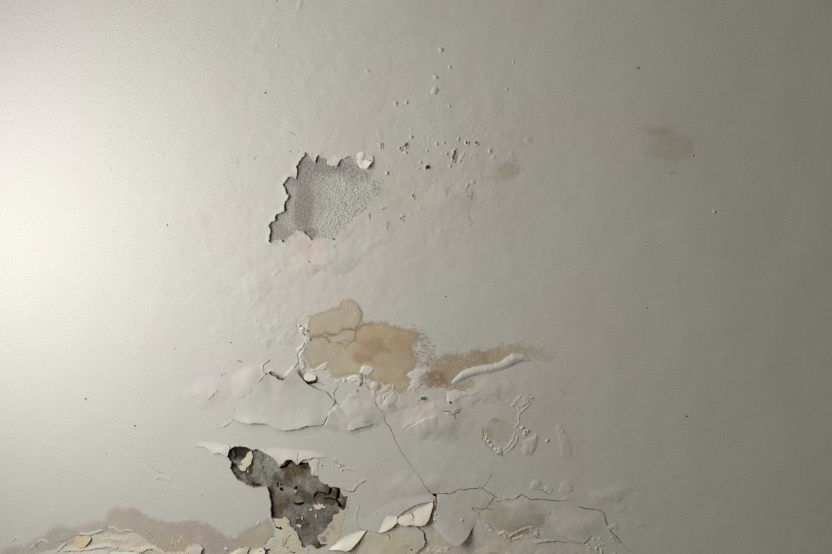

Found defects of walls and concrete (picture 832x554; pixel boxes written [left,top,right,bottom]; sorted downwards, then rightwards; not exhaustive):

flaking render [264,148,386,248]
crack [207,343,305,400]
water stain [305,300,520,393]
peeling [34,531,203,554]
peeling [194,441,600,554]
crack [320,385,623,544]